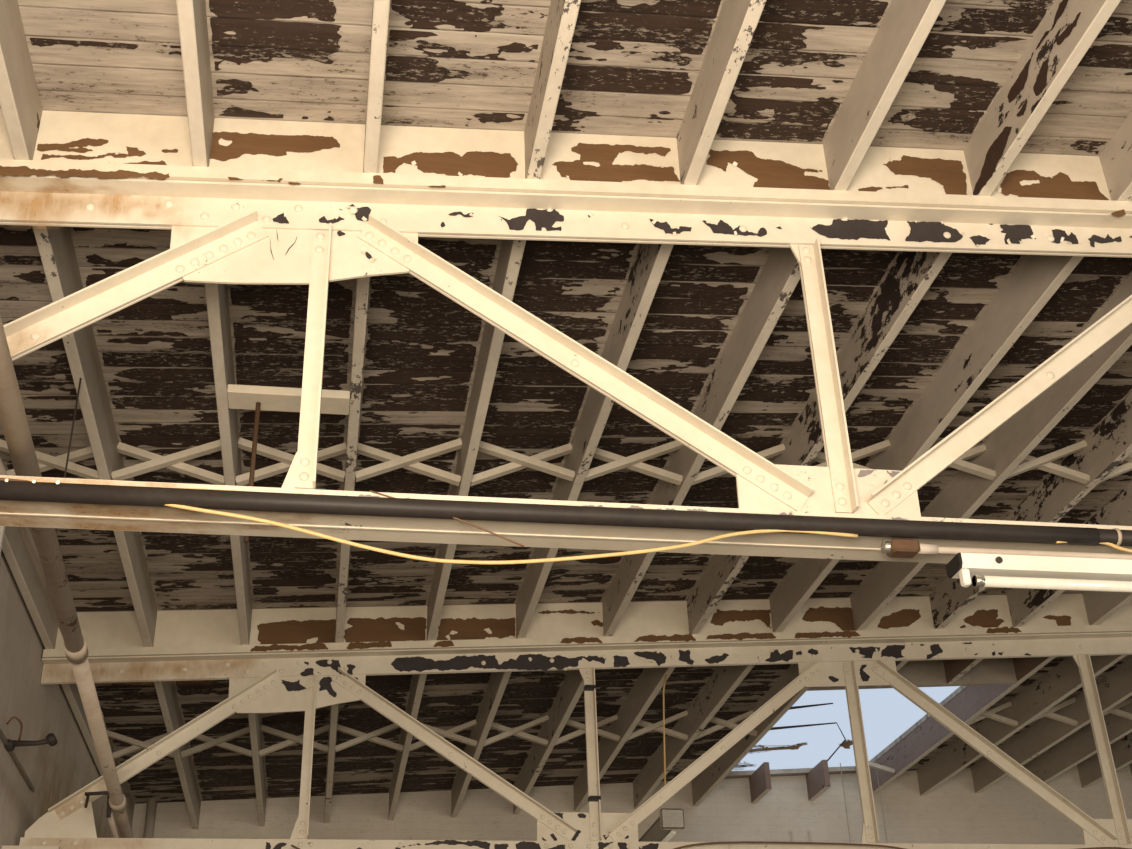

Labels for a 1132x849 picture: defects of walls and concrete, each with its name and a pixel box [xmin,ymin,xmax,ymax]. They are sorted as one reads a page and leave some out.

peeling [209,0,342,118]
peeling [386,0,538,83]
peeling [551,0,721,182]
peeling [707,0,888,190]
peeling [858,0,1132,217]
peeling [230,284,309,388]
peeling [316,275,482,499]
peeling [468,333,589,499]
peeling [499,208,637,354]
peeling [626,219,782,412]
peeling [845,221,1132,484]
peeling [190,536,943,801]